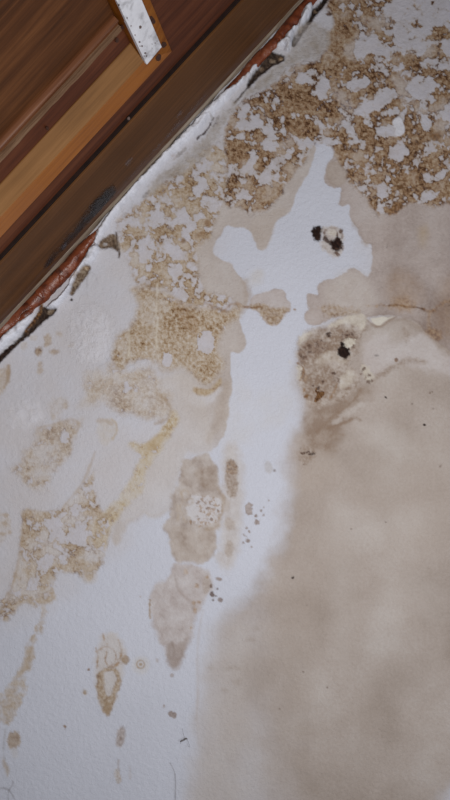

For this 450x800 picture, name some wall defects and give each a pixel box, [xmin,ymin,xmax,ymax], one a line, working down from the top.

leakage [90,629,131,718]
peeling [0,0,450,623]
leakage [110,147,450,800]